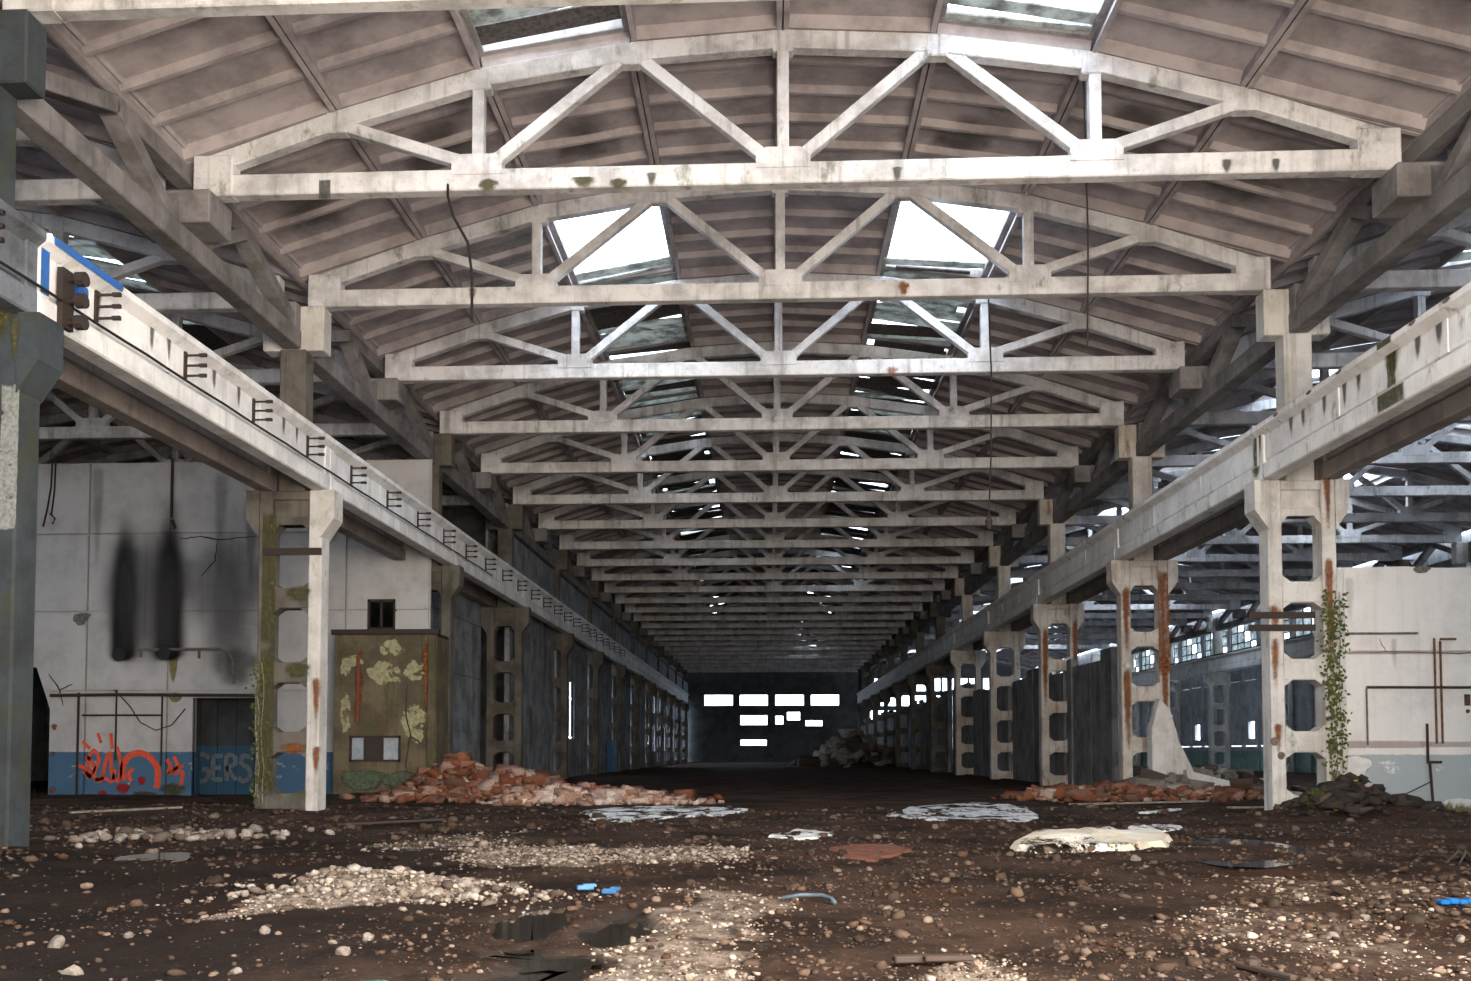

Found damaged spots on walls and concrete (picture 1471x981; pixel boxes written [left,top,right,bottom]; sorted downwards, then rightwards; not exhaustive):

damp [112,536,135,659]
damp [155,528,182,702]
corrosion [1158,573,1171,706]